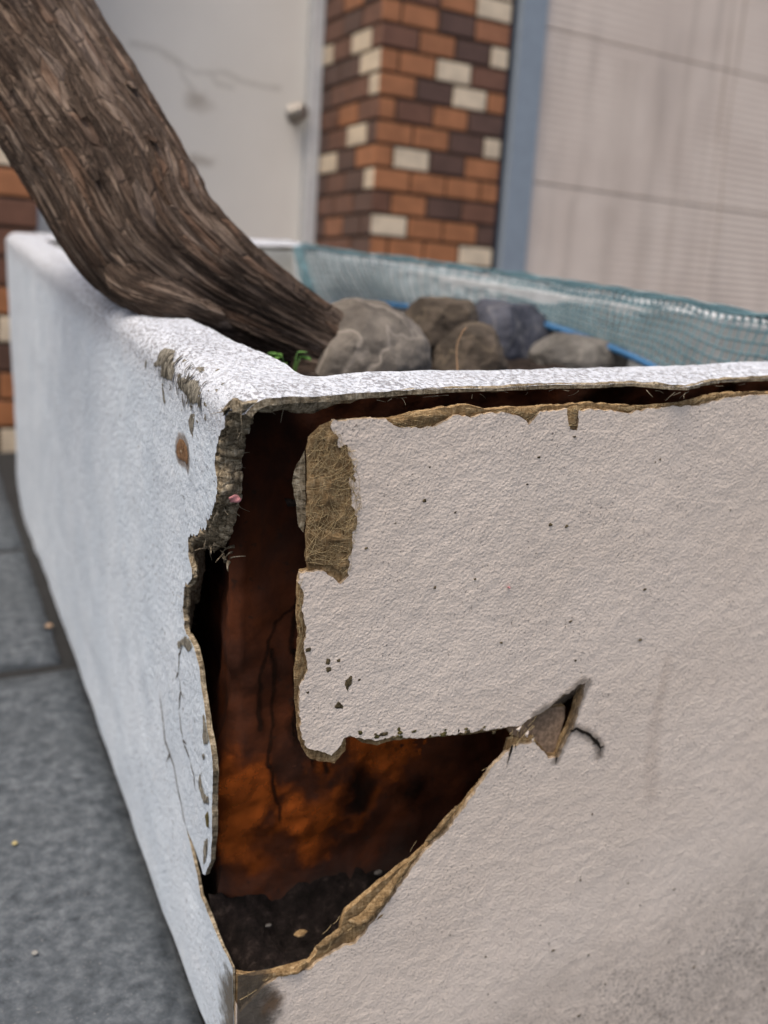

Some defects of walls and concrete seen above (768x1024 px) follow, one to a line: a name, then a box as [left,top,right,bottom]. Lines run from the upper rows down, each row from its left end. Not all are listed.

spalling [145,348,768,651]
crack [159,647,195,827]
spalling [293,579,311,729]
peeling [358,727,417,740]
peeling [429,703,565,753]
crack [570,728,604,755]
peeling [198,773,209,864]
spalling [266,803,464,980]